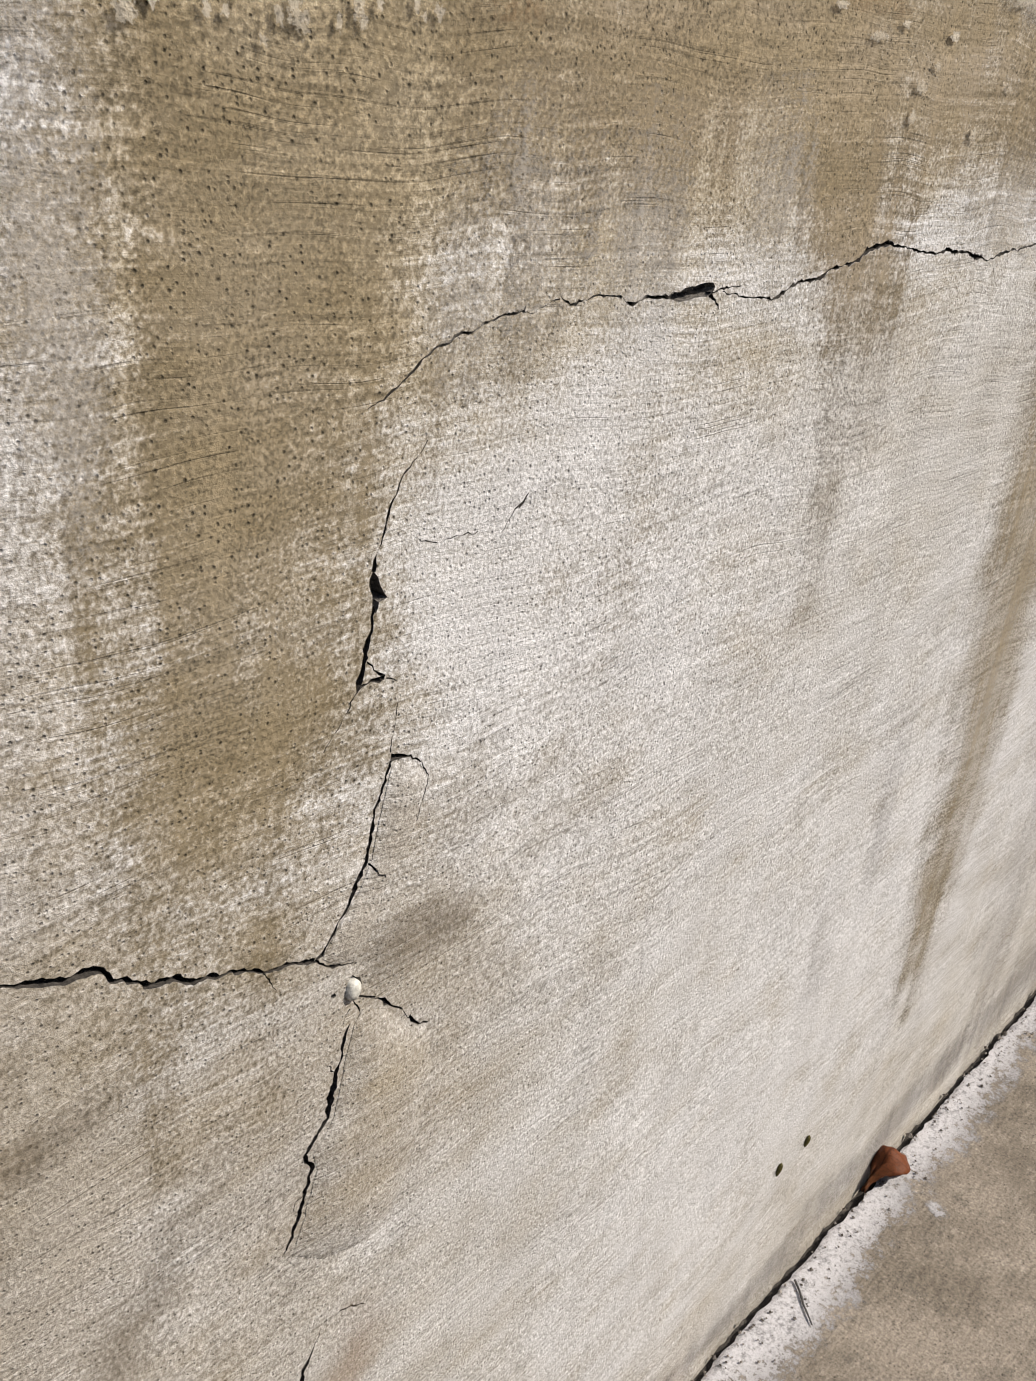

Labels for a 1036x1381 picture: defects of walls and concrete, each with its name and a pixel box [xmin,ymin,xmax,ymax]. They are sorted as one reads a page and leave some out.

crack [708,240,1036,309]
crack [368,293,671,409]
crack [372,440,528,572]
damp [0,0,1036,1082]
crack [0,606,429,1257]